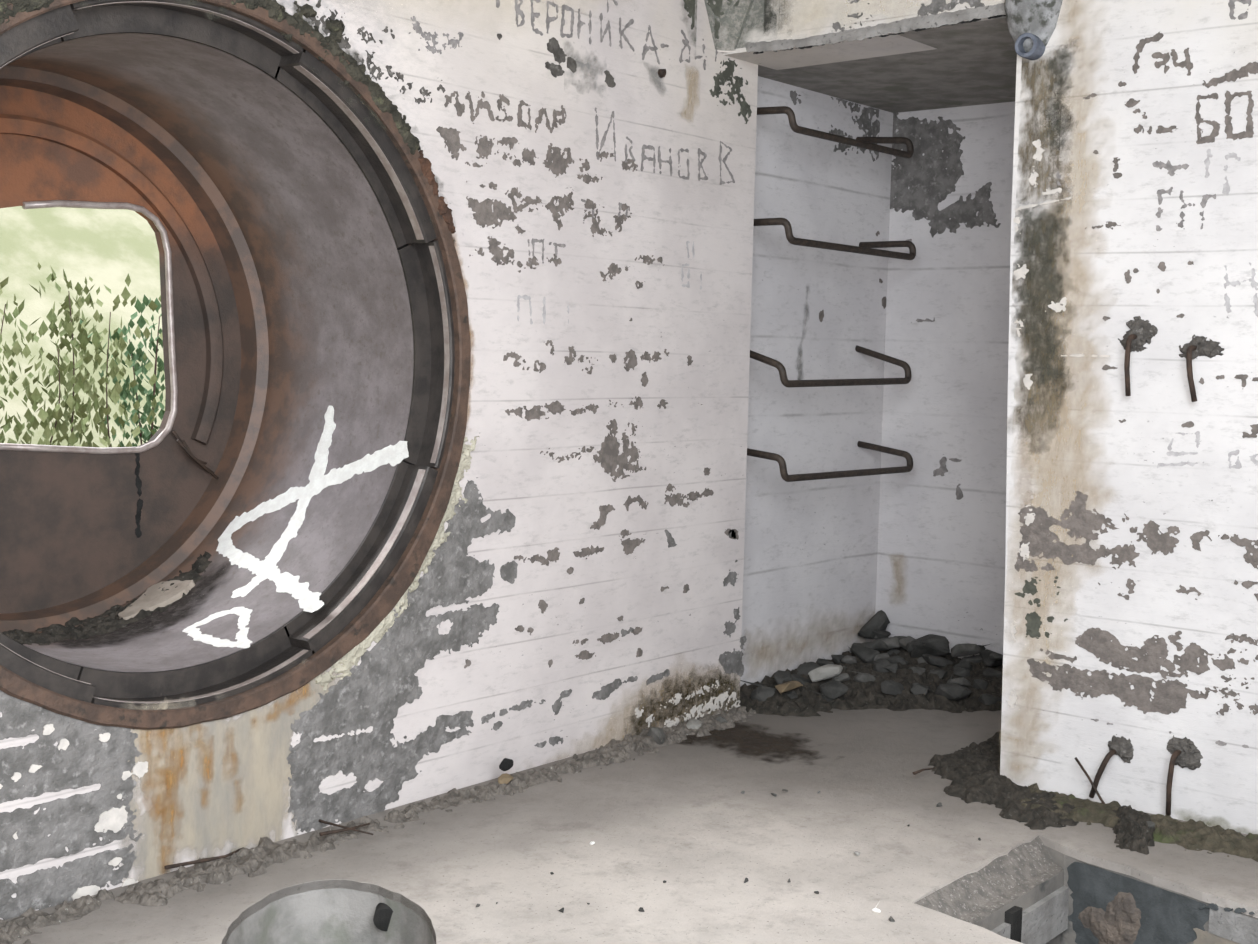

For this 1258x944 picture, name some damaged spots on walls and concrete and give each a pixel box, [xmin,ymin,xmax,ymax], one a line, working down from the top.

peeling [436,126,638,273]
peeling [819,97,1021,238]
leakage [1012,50,1087,557]
peeling [503,340,669,482]
peeling [590,495,649,530]
peeling [0,690,148,920]
rust [123,669,337,881]
peeling [287,477,604,834]
peeling [572,616,643,660]
leakage [611,672,817,761]
peeling [1010,491,1258,716]
leakage [1067,862,1210,944]